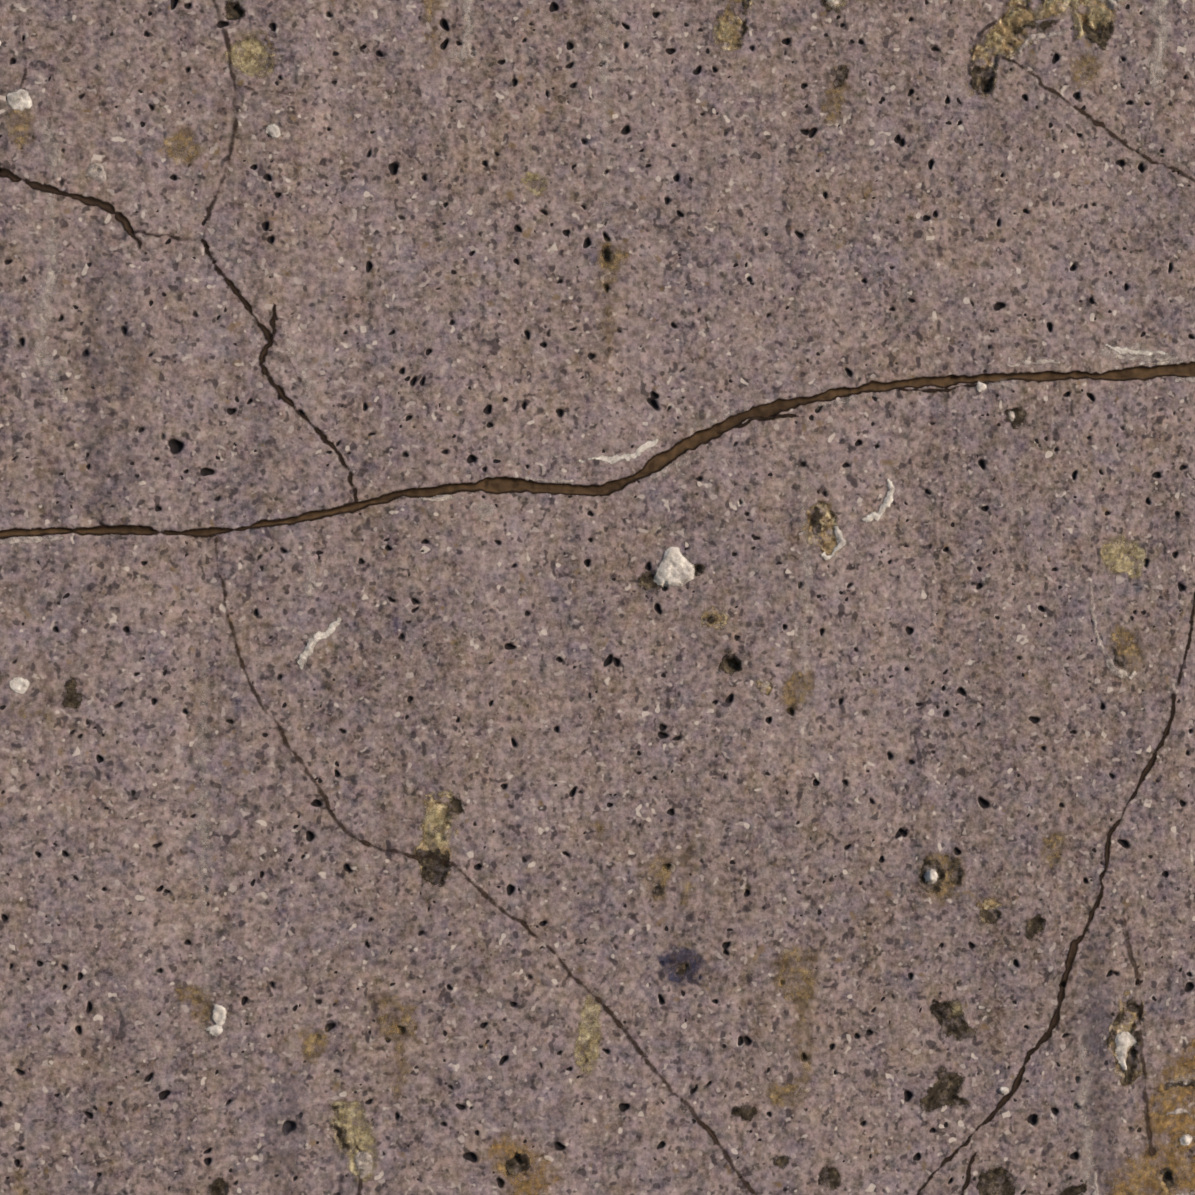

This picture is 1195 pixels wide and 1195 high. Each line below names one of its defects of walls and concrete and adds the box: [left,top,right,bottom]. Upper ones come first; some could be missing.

crack [214,0,253,158]
crack [1002,56,1195,182]
crack [0,122,181,254]
crack [207,178,224,221]
crack [0,239,1195,1195]